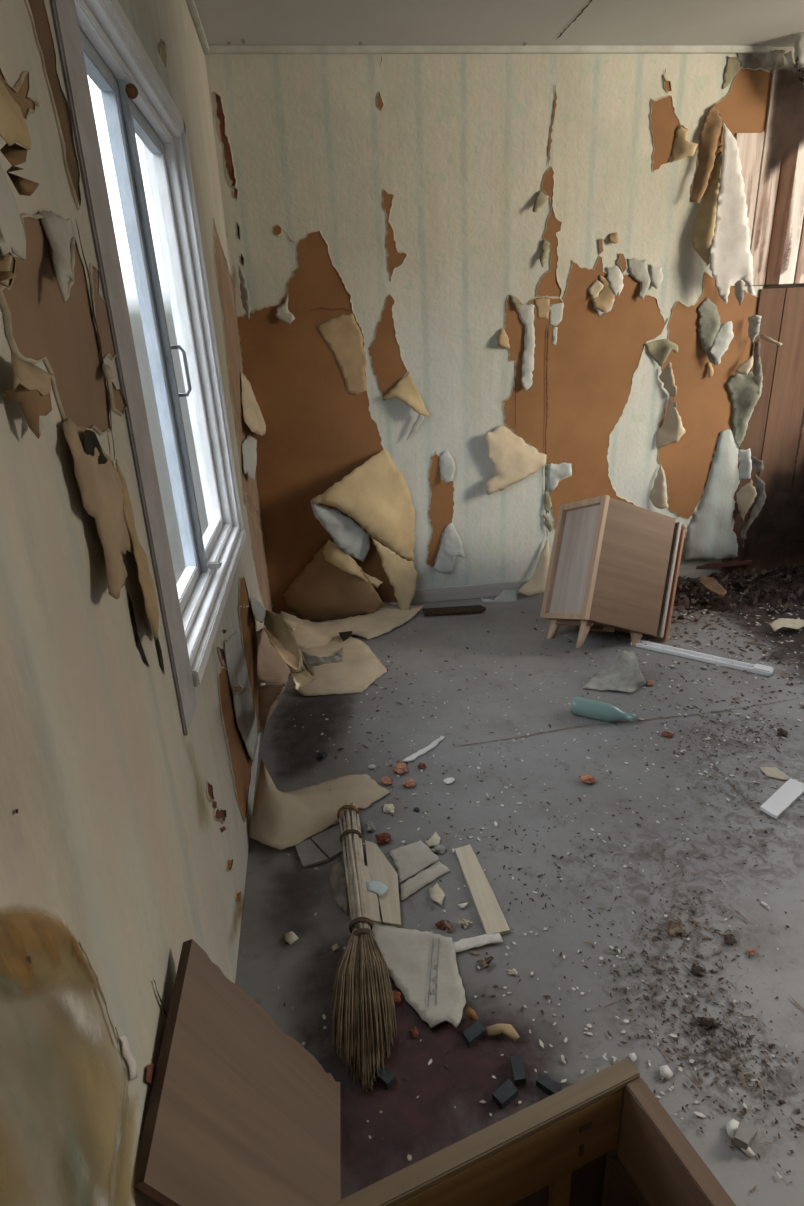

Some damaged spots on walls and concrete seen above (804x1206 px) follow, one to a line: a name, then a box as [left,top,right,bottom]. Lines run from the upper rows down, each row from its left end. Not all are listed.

crack [557,0,592,39]
peeling [226,223,251,319]
peeling [542,489,553,532]